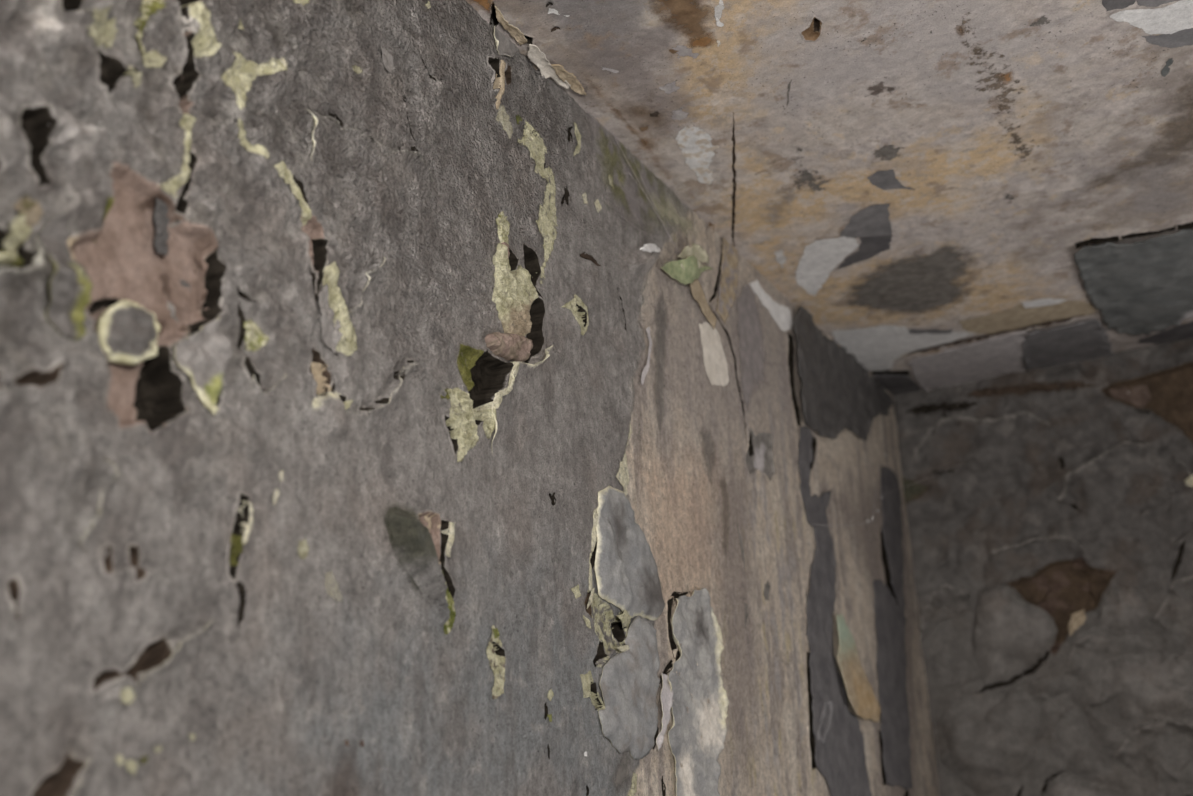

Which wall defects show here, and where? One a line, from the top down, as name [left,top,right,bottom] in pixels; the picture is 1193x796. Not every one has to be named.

flaking render [94,45,139,99]
peeling [488,0,587,96]
peeling [1102,0,1193,77]
flaking render [16,102,61,191]
flaking render [0,160,233,437]
peeling [274,161,386,398]
peeling [774,204,892,295]
damp [850,246,972,313]
flaking render [455,242,560,458]
peeling [571,275,729,796]
peeling [661,221,1193,796]
flaking render [90,634,176,712]